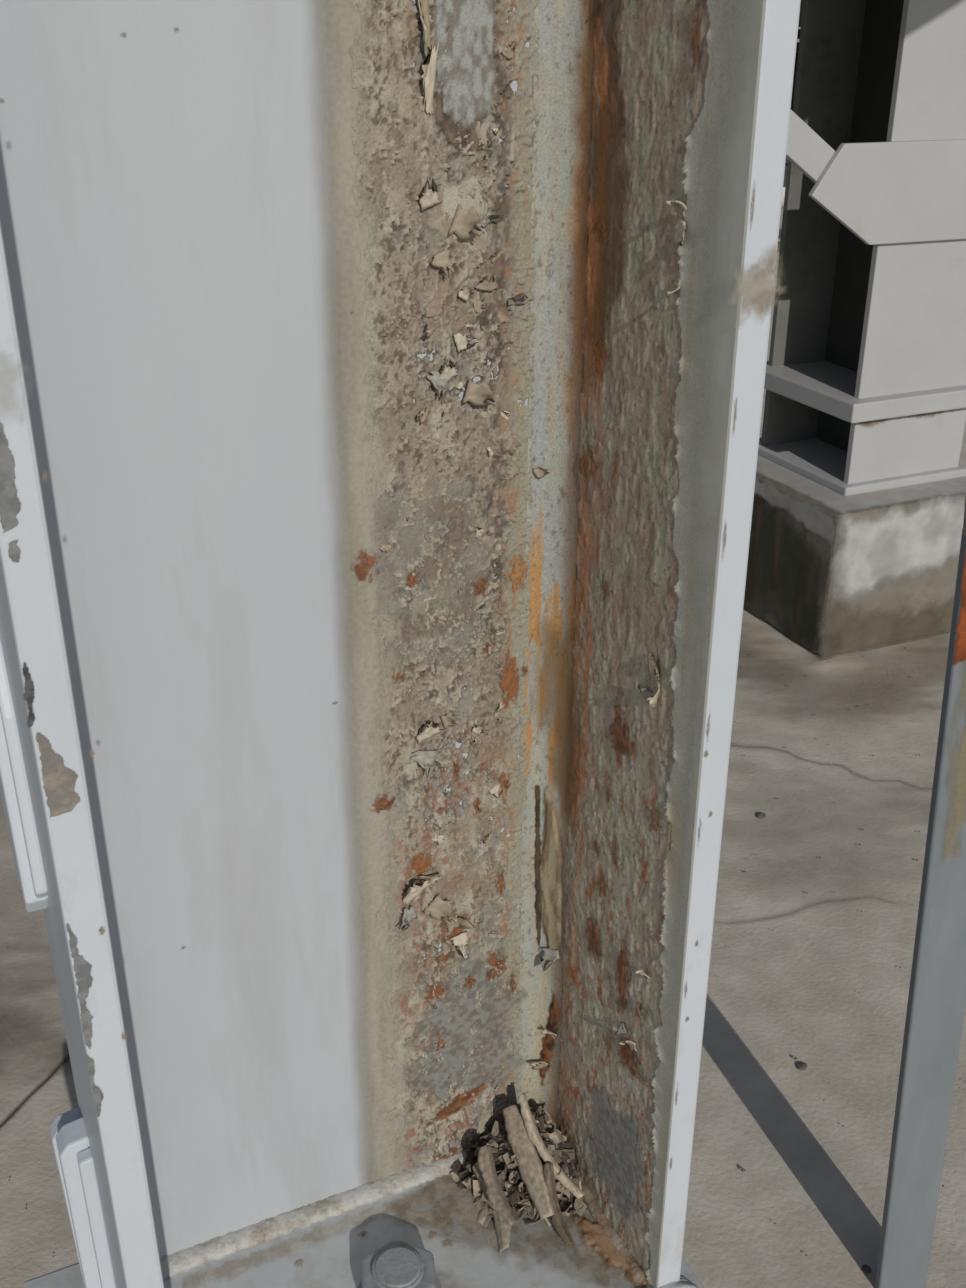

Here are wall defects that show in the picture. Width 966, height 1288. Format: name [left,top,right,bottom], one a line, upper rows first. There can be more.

peeling [0,423,21,562]
peeling [349,0,563,1171]
corrosion [463,0,710,1288]
peeling [645,0,744,1288]
corrosion [954,554,966,665]
peeling [23,663,80,817]
peeling [66,924,103,1117]
corrosion [425,982,446,1001]
corrosion [438,911,467,963]
corrosion [429,1084,486,1126]